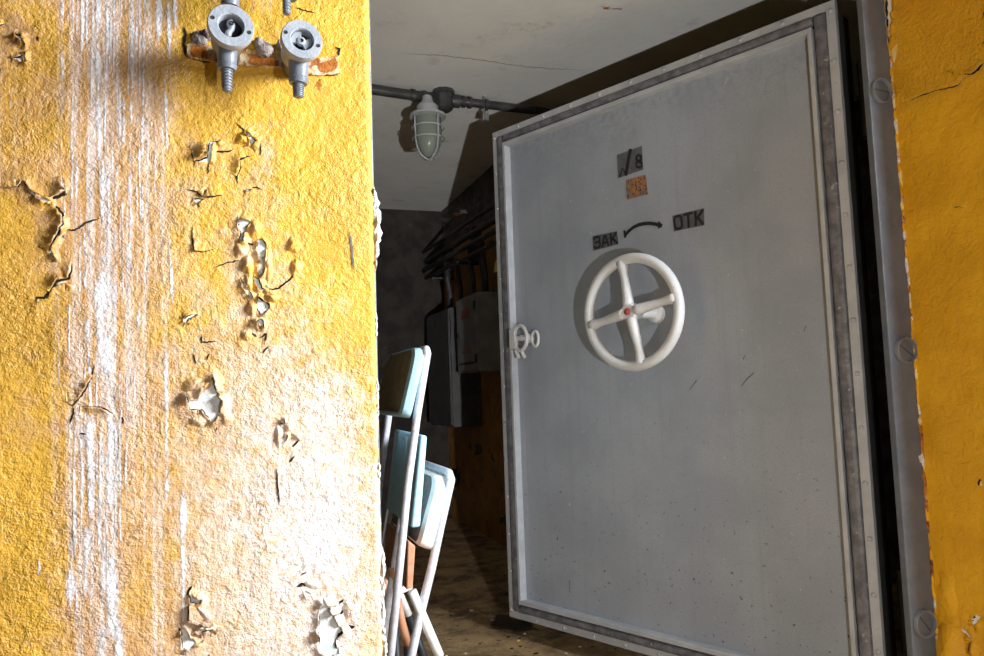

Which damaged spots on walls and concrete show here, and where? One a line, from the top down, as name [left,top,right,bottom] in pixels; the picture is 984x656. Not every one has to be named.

peeling [0,29,39,72]
crack [894,12,984,102]
peeling [185,123,262,173]
crack [0,174,100,304]
damp [57,0,178,656]
peeling [179,311,202,327]
peeling [215,213,303,353]
spalling [884,0,938,640]
crack [66,363,124,435]
spalling [174,335,235,431]
peeling [174,586,219,656]
spalling [297,572,357,656]